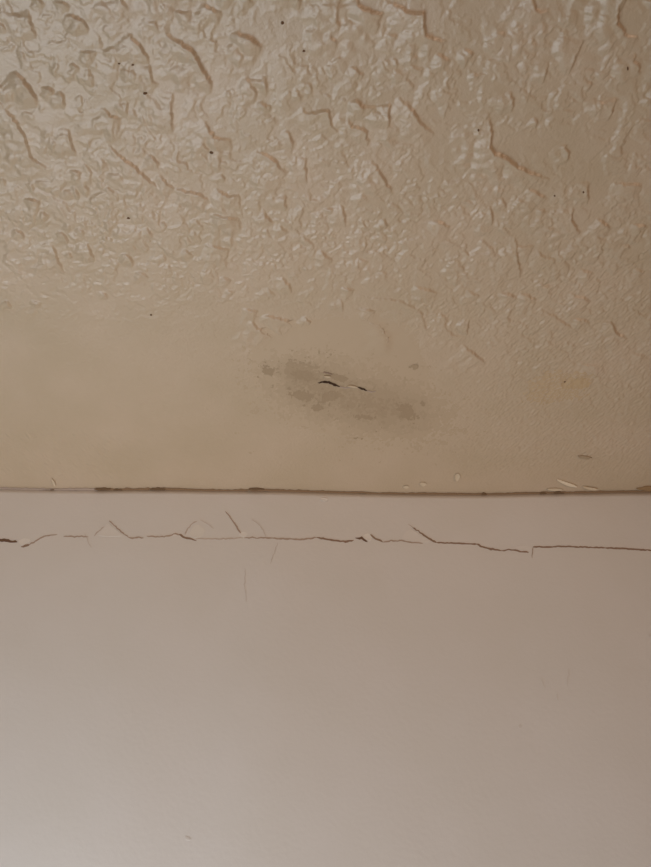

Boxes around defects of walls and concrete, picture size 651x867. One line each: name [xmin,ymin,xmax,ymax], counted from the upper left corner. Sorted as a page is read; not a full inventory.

crack [319,372,376,393]
damp [232,334,488,465]
crack [0,487,651,562]